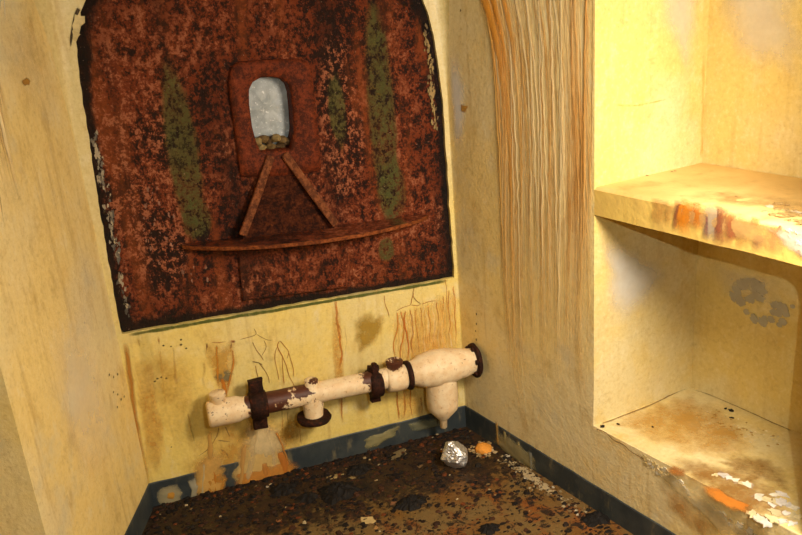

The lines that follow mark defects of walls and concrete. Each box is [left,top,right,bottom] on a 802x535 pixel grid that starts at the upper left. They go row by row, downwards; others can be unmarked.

rust [667,202,777,247]
spalling [761,202,802,254]
damp [358,318,380,346]
crack [384,289,436,315]
rust [393,280,456,360]
peeling [642,455,802,535]